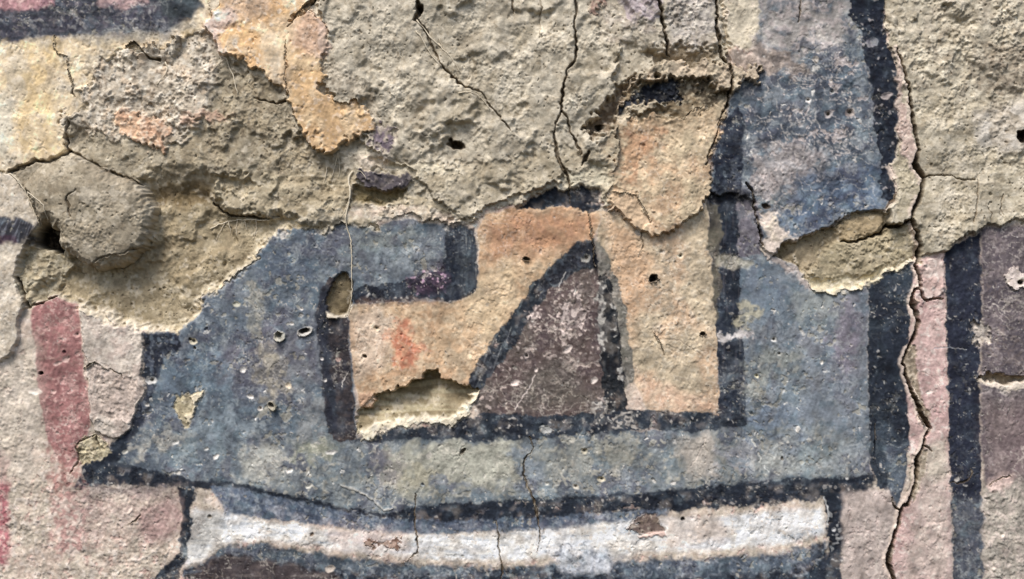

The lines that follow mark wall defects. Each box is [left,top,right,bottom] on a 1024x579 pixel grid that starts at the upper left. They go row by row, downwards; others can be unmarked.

crack [7,36,146,187]
crack [125,40,162,62]
spalling [19,0,765,345]
crack [413,0,511,131]
crack [553,0,597,268]
crack [657,0,671,58]
crack [705,0,735,166]
spalling [773,0,1024,297]
crack [841,48,1012,579]
spalling [77,434,112,465]
spalling [173,391,204,428]
spalling [356,370,480,442]